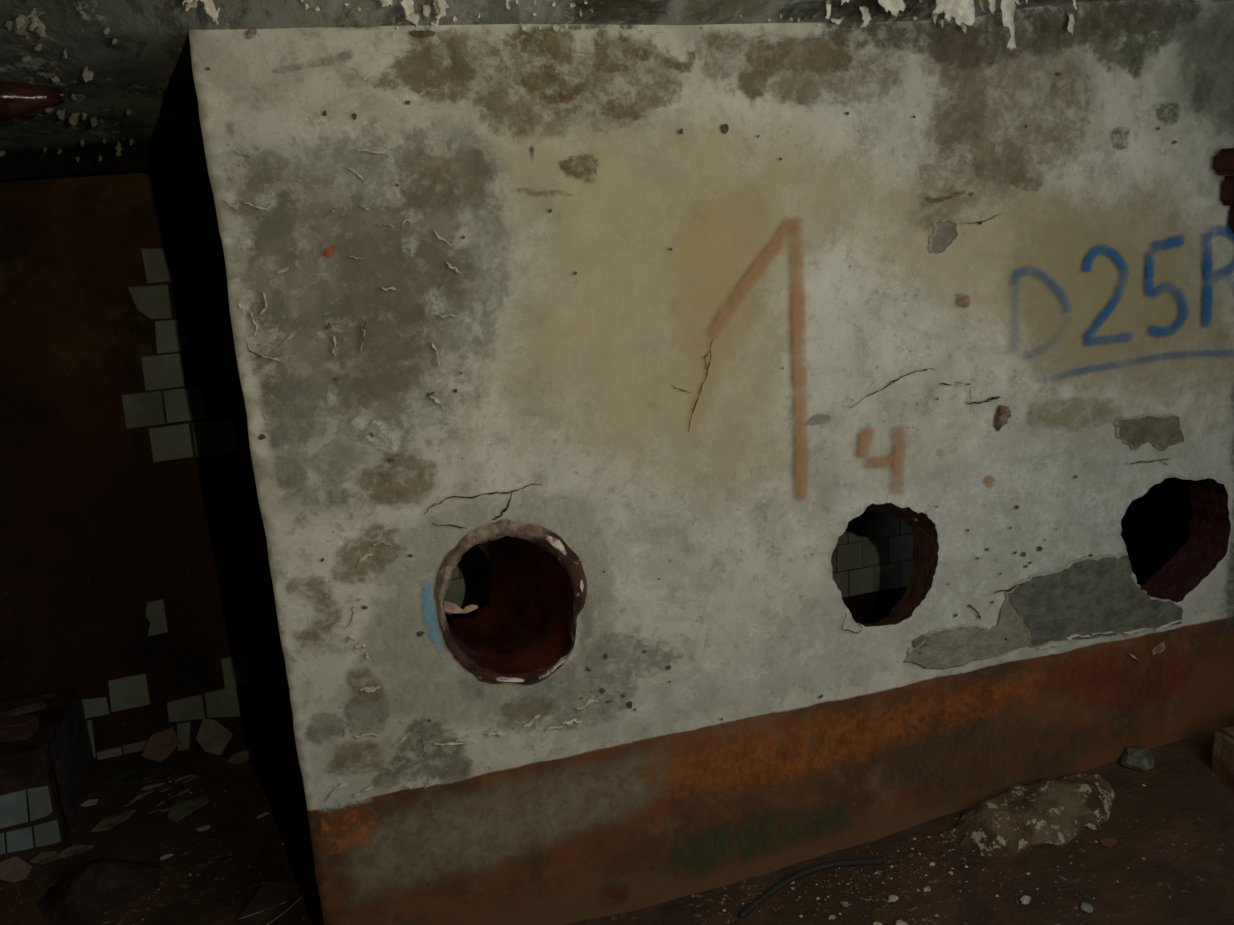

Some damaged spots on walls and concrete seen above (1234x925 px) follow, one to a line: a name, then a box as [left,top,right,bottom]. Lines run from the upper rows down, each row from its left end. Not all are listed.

peeling [182,0,235,26]
peeling [380,0,457,38]
peeling [520,0,602,32]
peeling [768,0,1028,50]
peeling [1067,0,1077,35]
damp [367,0,1234,474]
damp [233,133,503,505]
crack [672,339,714,432]
crack [425,484,542,528]
damp [288,526,405,641]
flaking render [904,528,1183,669]
damp [307,669,472,786]